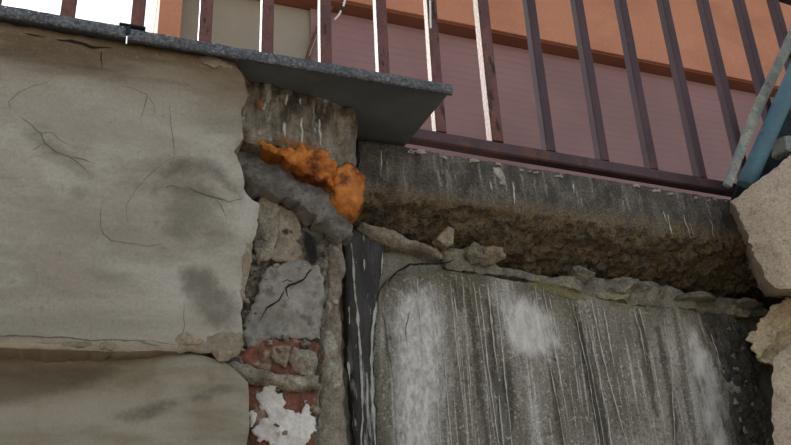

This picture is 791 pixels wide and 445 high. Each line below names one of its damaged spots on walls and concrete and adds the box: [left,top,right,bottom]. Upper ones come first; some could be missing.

crack [25,33,112,63]
crack [8,82,90,170]
crack [165,185,242,216]
spalling [492,162,506,186]
peeling [249,385,317,445]
crack [260,269,312,320]
damp [348,244,377,445]
damp [390,275,476,445]
damp [473,281,571,445]
damp [572,300,627,445]
damp [686,314,729,445]
spalling [697,313,770,445]